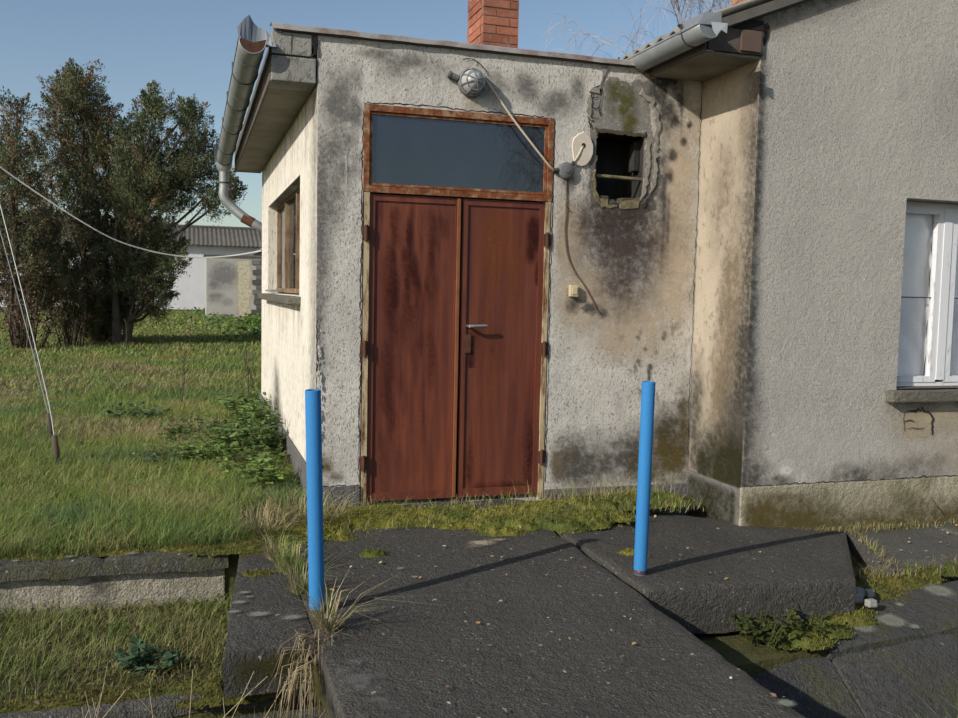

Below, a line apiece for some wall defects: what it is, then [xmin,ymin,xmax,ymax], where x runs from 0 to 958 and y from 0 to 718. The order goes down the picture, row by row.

water stain [557,77,697,357]
rust [386,212,433,330]
rust [526,218,539,286]
water stain [653,53,764,487]
spalling [903,407,934,438]
water stain [552,431,639,486]
water stain [838,468,868,481]